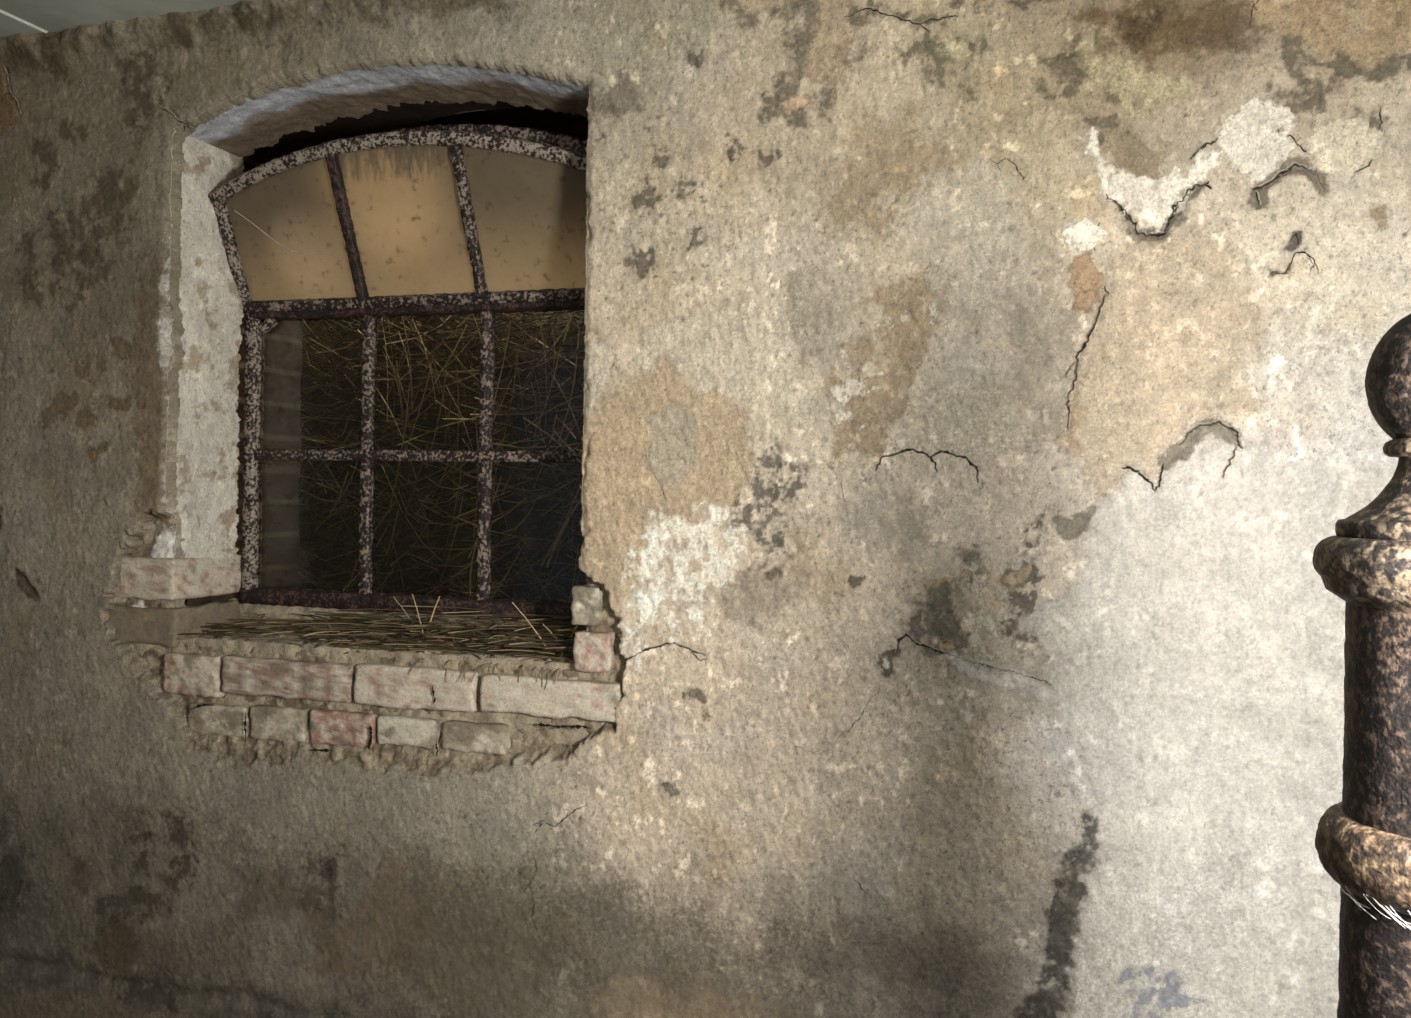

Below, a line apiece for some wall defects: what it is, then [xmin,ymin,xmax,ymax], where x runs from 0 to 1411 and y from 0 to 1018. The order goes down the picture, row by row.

flaking render [688,50,704,68]
flaking render [632,147,703,215]
flaking render [726,134,782,168]
flaking render [42,336,134,430]
crack [1065,285,1110,430]
flaking render [106,160,1043,778]
crack [875,447,980,483]
crack [1122,419,1245,492]
peeling [937,37,1392,1018]
crack [787,632,1053,754]
leakage [0,811,782,1018]
leakage [1044,881,1075,969]